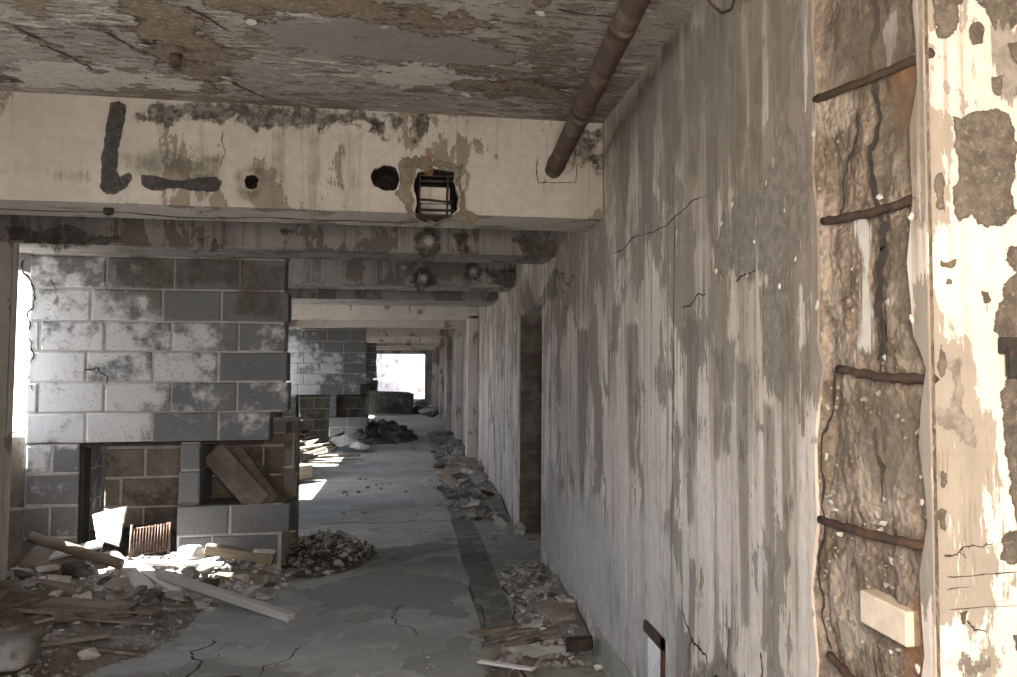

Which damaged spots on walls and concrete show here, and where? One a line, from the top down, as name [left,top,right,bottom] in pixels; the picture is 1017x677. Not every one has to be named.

peeling [0,0,571,99]
peeling [394,155,478,225]
spalling [713,0,1017,677]
rust [835,365,940,385]
rust [817,515,924,551]
crack [391,604,418,635]
crack [185,640,216,677]
peeling [683,655,745,677]
rust [826,651,856,677]